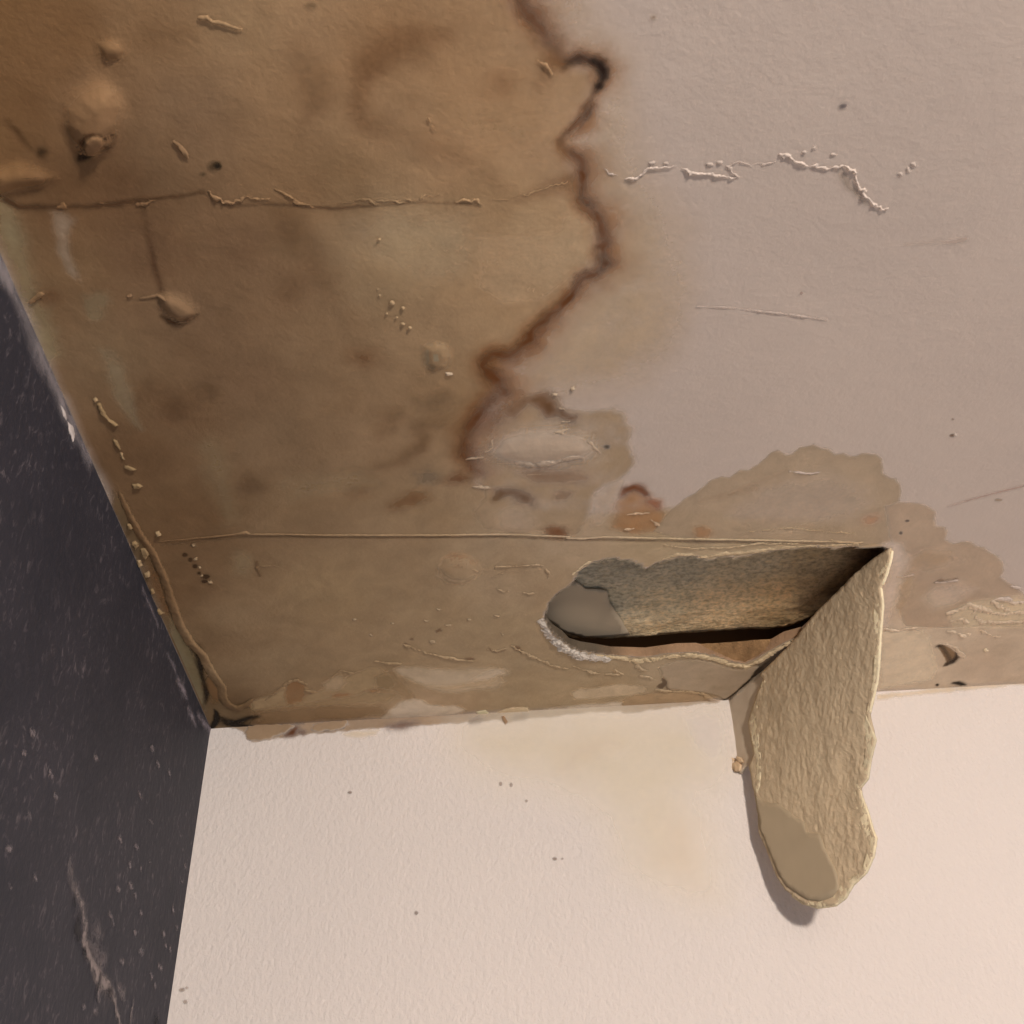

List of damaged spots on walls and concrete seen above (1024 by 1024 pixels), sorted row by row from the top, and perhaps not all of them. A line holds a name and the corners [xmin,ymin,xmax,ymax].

crack [0,177,568,210]
crack [606,146,889,211]
damp [0,0,1024,726]
crack [159,531,864,543]
crack [195,654,259,729]